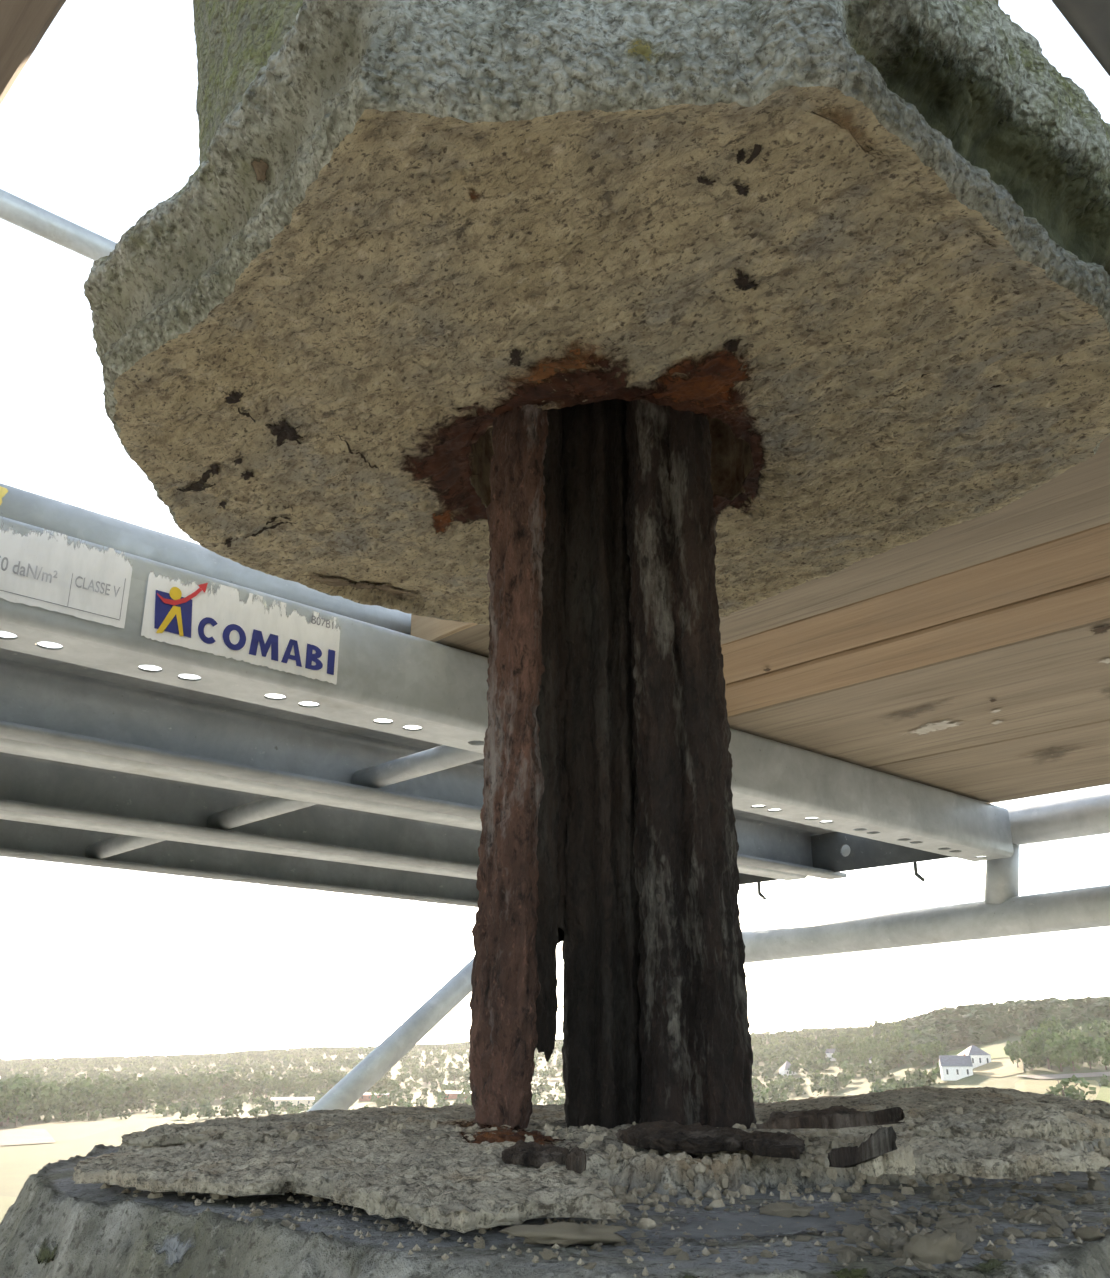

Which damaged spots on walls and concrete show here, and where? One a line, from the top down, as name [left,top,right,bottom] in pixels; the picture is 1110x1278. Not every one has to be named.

rust [399,343,766,534]
spalling [856,1138,916,1178]